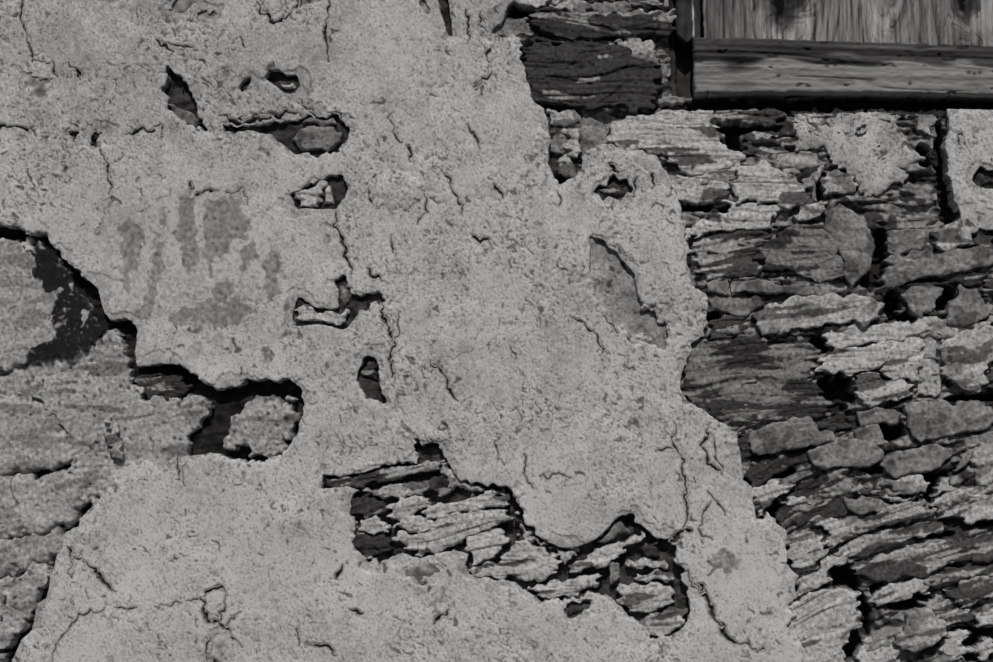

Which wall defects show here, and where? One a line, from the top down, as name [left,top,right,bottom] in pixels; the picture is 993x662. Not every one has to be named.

crack [17,0,83,80]
spalling [438,0,452,36]
spalling [164,69,208,131]
spalling [224,115,350,158]
spalling [292,175,348,209]
spalling [293,275,385,330]
flaking render [493,0,993,662]
flaking render [0,227,305,662]
crack [655,421,727,545]
flaking render [323,439,690,638]
crack [51,546,243,662]
crack [685,569,765,654]